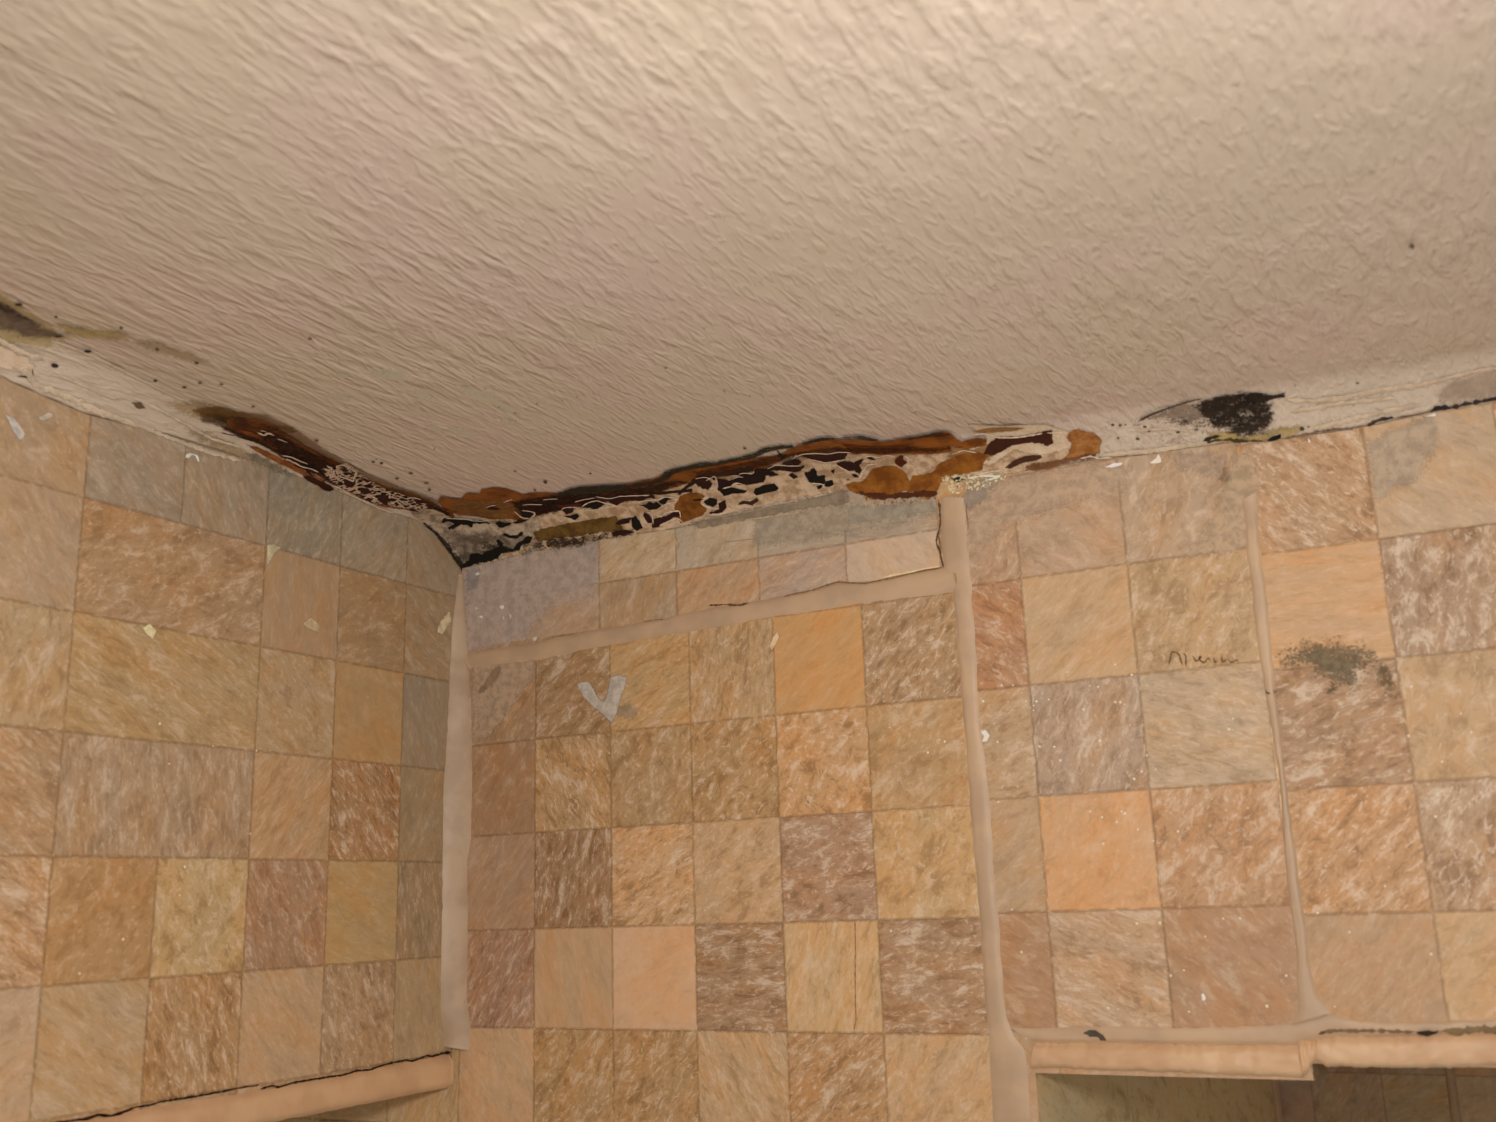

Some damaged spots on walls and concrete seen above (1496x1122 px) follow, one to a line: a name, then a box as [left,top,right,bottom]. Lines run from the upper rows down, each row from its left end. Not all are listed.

leakage [0,294,127,368]
crack [132,401,145,409]
leakage [1111,385,1329,444]
peeling [1285,367,1496,443]
crack [1285,397,1496,439]
peeling [258,425,1216,566]
leakage [1279,640,1396,698]